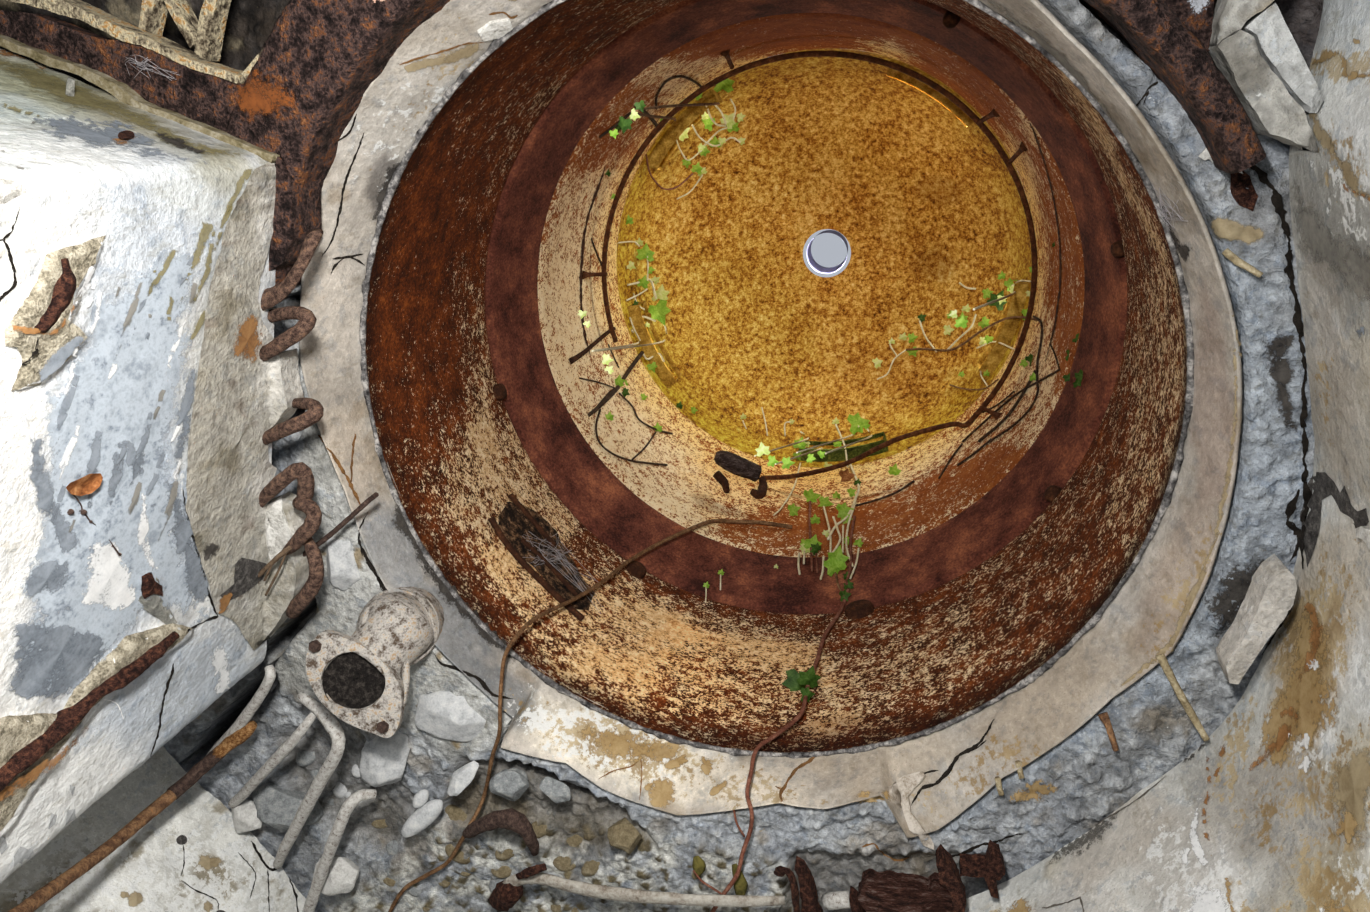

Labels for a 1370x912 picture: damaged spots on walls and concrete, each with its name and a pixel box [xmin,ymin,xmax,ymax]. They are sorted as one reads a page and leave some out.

crack [0,209,20,301]
crack [22,337,39,365]
spalling [4,235,106,391]
crack [1250,165,1312,569]
spalling [262,397,324,445]
corrosion [219,593,233,614]
crack [1262,605,1294,655]
crack [911,719,994,805]
leakage [1298,756,1311,773]
leakage [1329,748,1370,847]